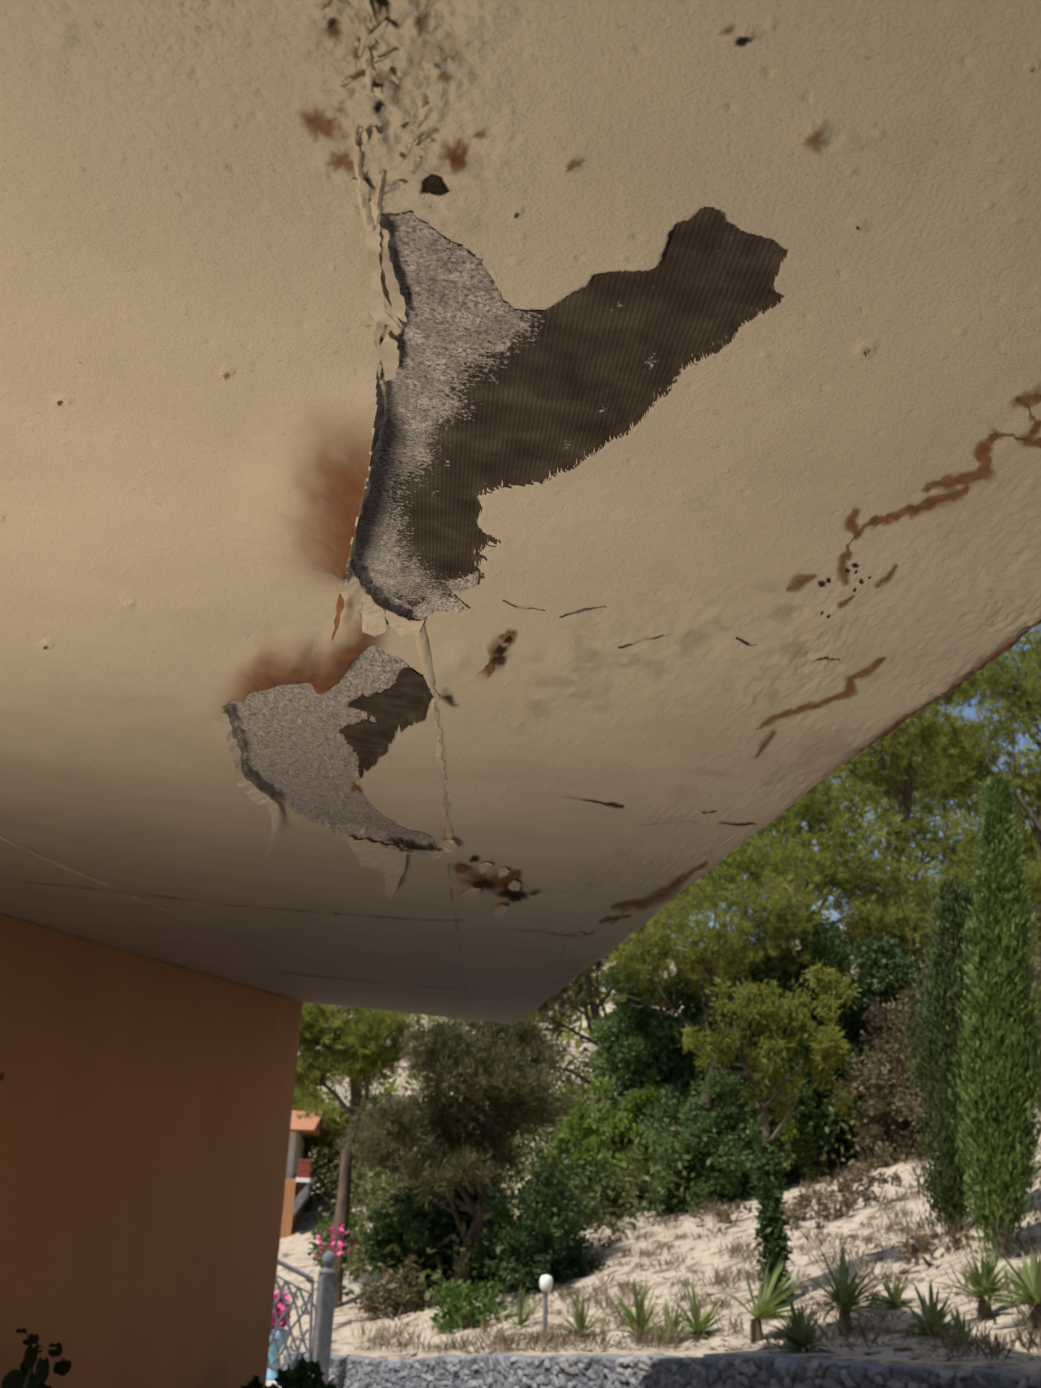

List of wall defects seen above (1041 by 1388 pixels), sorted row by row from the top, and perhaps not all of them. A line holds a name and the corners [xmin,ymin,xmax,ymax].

spalling [326,19,338,37]
peeling [346,0,398,69]
peeling [221,90,788,900]
crack [844,392,1041,559]
crack [503,600,606,618]
crack [443,695,454,706]
crack [755,657,885,757]